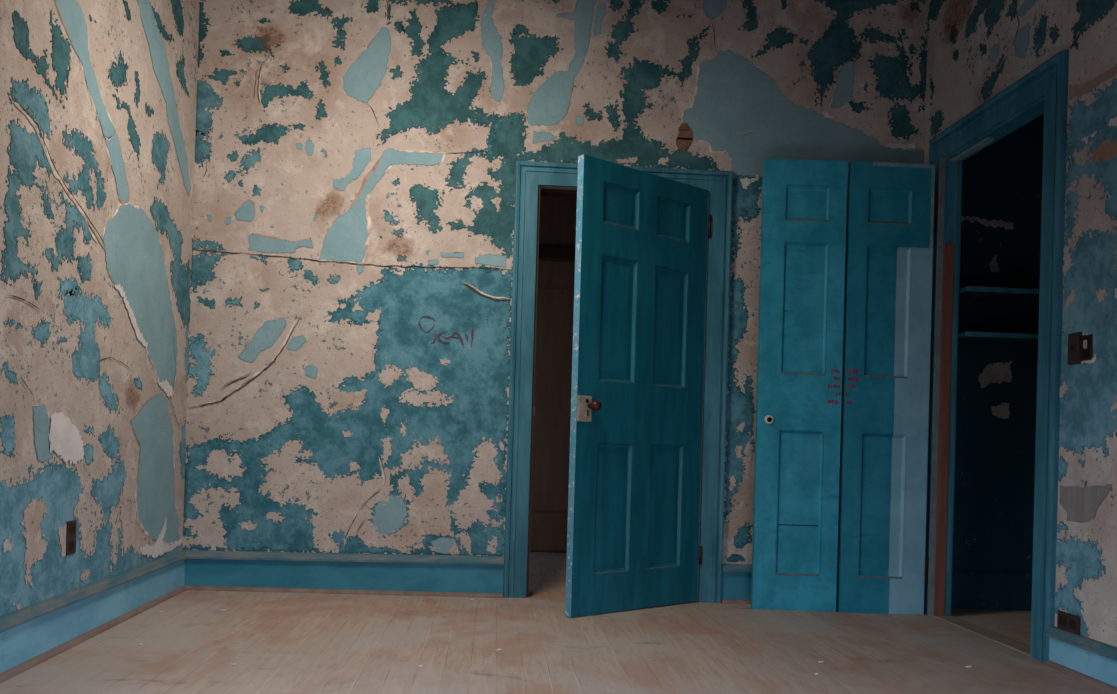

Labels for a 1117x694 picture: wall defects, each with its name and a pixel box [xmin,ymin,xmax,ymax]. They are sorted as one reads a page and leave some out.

peeling [949,0,1116,102]
crack [11,97,105,249]
crack [192,249,511,301]
peeling [0,0,946,616]
peeling [961,216,1014,230]
peeling [1058,77,1117,487]
crack [171,318,300,427]
peeling [978,361,1012,388]
peeling [991,402,1010,419]
peeling [1055,521,1106,637]